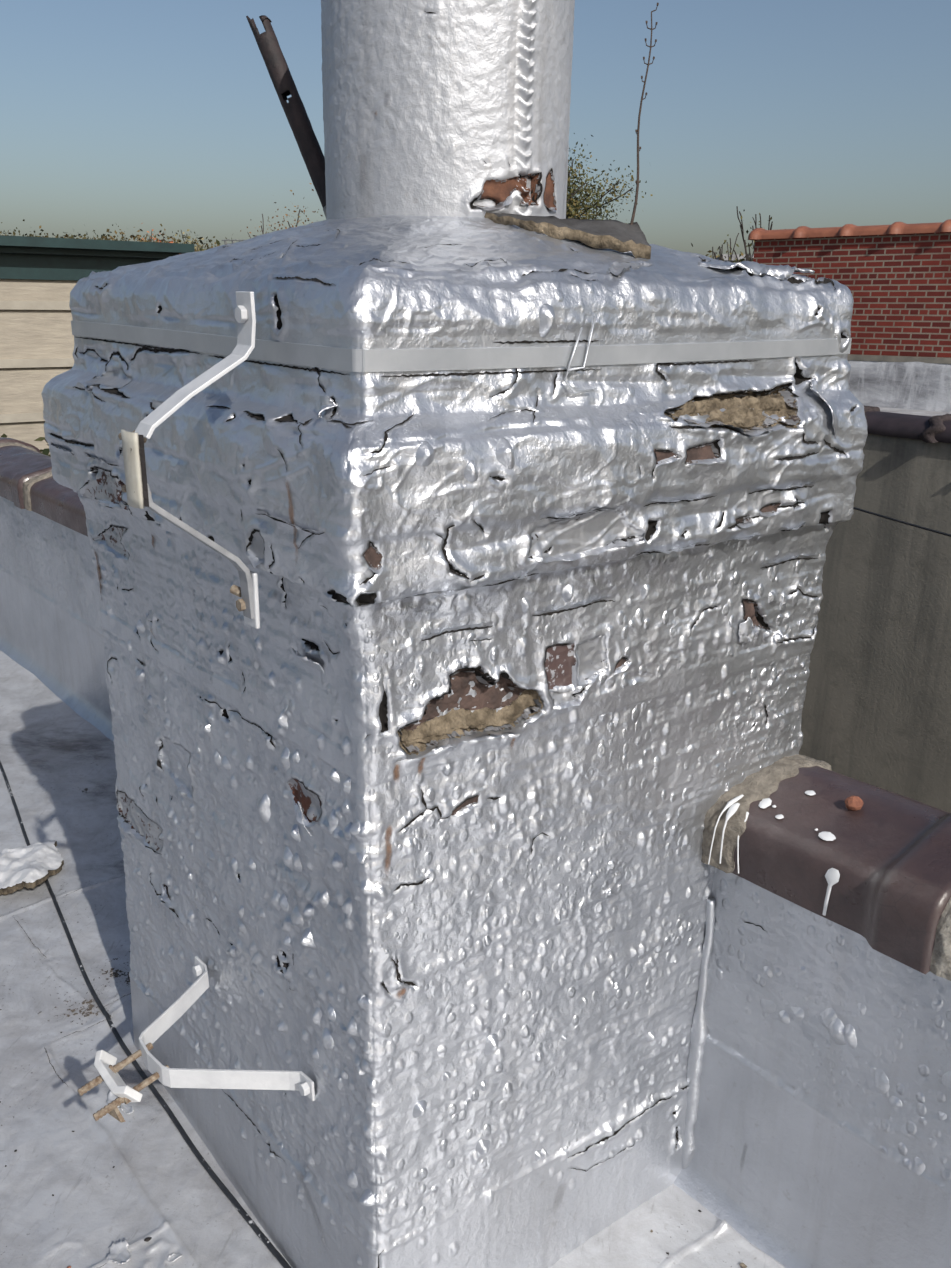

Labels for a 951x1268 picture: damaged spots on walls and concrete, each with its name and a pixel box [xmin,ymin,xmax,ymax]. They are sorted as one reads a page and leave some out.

peeling [475,168,557,212]
crack [74,347,189,402]
crack [277,367,414,476]
crack [492,368,558,423]
spalling [654,378,838,466]
crack [775,426,847,461]
crack [418,520,485,582]
peeling [611,657,632,675]
spalling [397,643,584,760]
peeling [116,789,163,852]
peeling [287,779,322,837]
crack [399,786,449,832]